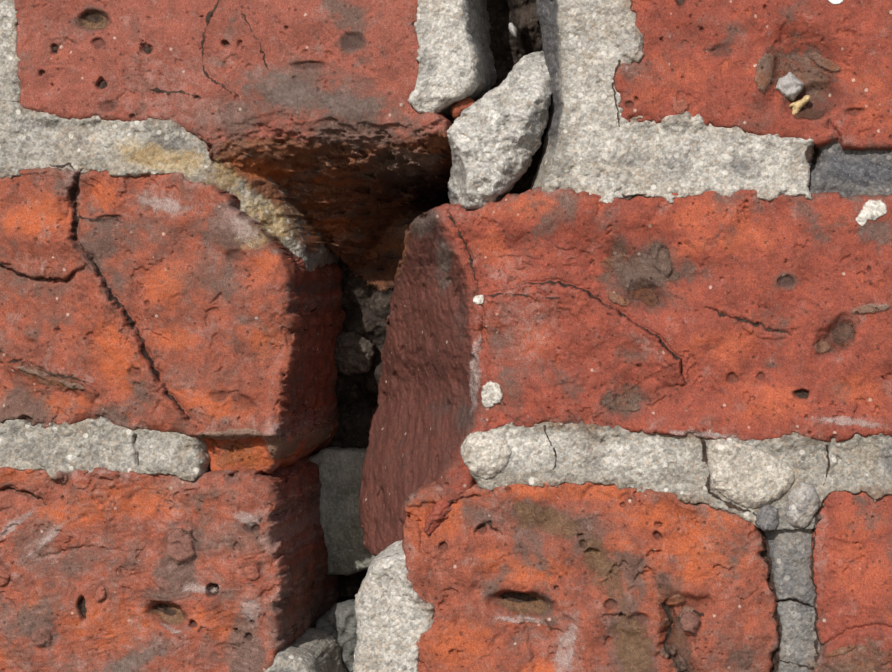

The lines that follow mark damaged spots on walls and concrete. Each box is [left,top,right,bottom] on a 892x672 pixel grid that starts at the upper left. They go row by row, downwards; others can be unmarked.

crack [487,0,543,91]
peeling [451,97,475,119]
crack [612,59,621,127]
crack [502,125,547,197]
crack [0,163,189,419]
crack [447,212,685,382]
crack [313,258,394,454]
crack [543,425,557,472]
crack [338,569,368,603]
crack [698,431,830,672]
crack [662,602,682,672]